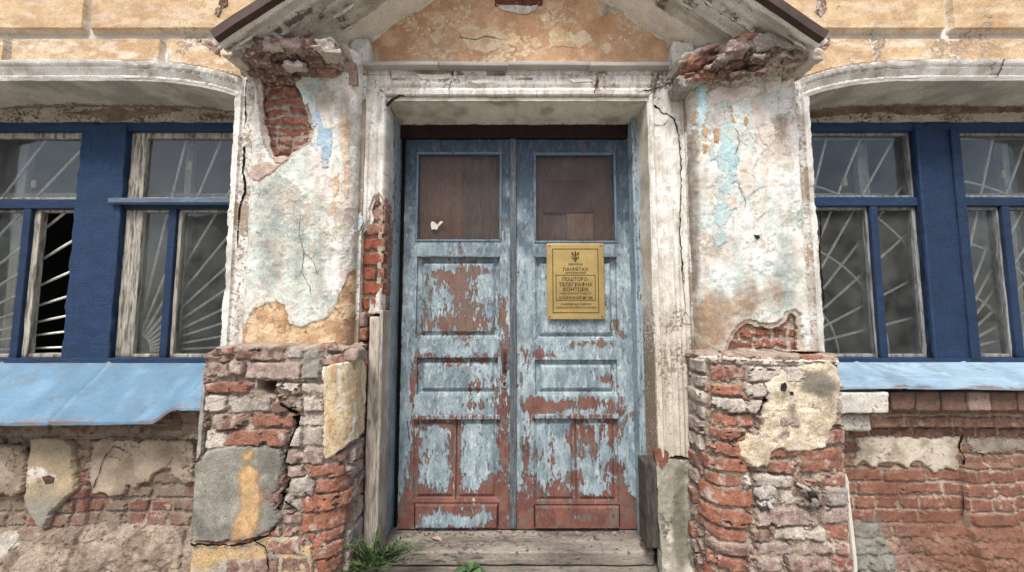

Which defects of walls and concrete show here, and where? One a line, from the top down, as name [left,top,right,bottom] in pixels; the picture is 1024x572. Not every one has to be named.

crack [237,79,247,248]
flaking render [250,76,352,216]
crack [640,71,691,325]
flaking render [242,190,389,459]
flaking render [724,309,804,353]
flaking render [0,367,314,572]
crack [190,380,301,572]
flaking render [852,435,1024,473]
crack [958,434,966,519]